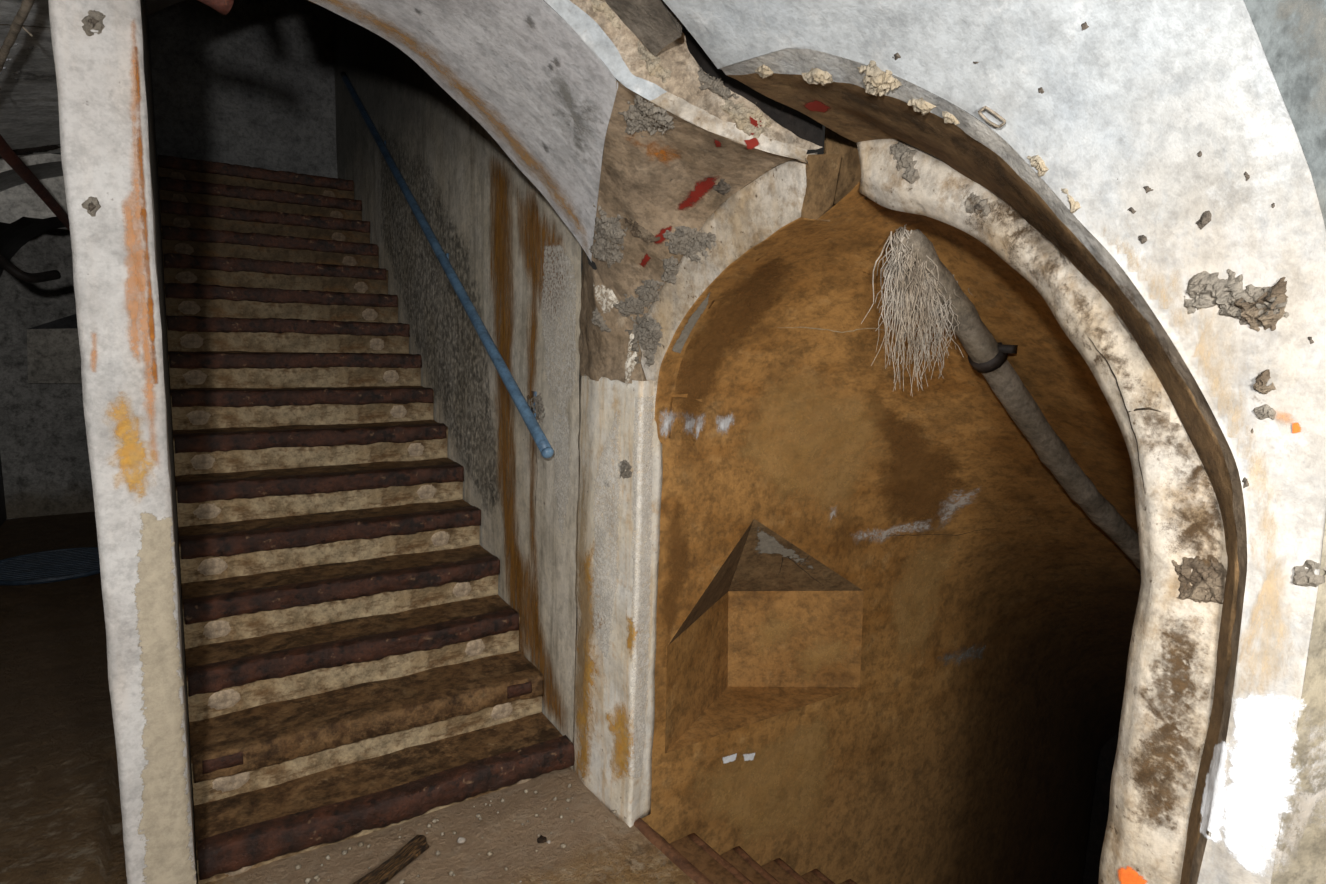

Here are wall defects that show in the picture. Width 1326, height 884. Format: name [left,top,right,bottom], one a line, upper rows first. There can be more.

spalling [618,95,675,137]
rust [125,47,157,415]
spalling [588,205,717,268]
peeling [593,283,619,313]
flaking render [672,292,711,353]
spalling [1183,269,1289,332]
peeling [625,334,637,386]
rust [490,164,565,655]
spalling [1171,556,1227,604]
spalling [1292,560,1326,587]
rust [575,554,635,778]
rust [627,619,638,653]